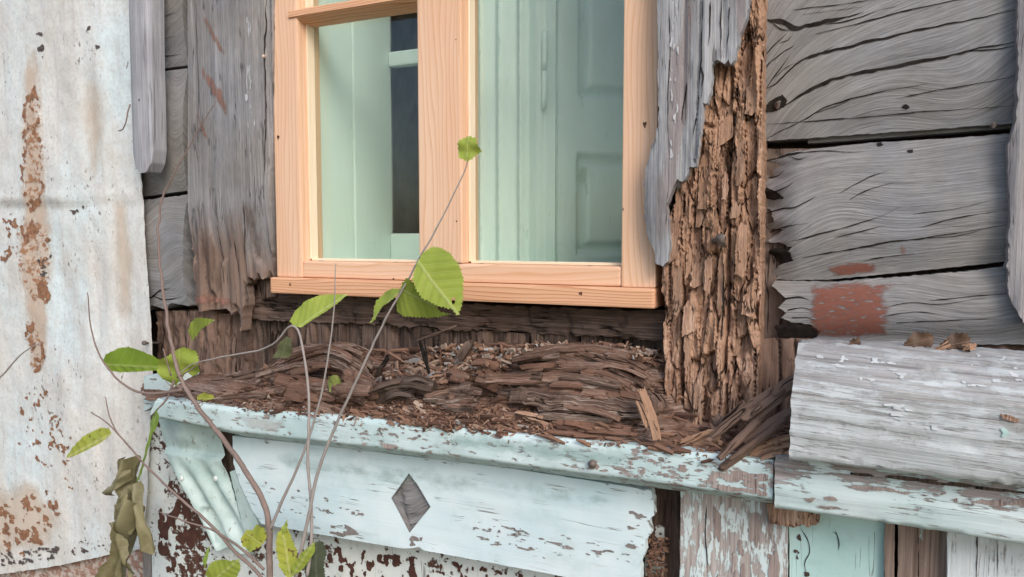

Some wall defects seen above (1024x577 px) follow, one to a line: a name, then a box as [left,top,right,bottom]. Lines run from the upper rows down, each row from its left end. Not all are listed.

crack [766,0,1016,261]
rust [16,67,51,373]
spalling [661,0,768,425]
crack [784,296,816,321]
crack [880,293,1009,323]
peeling [350,424,421,450]
peeling [586,458,687,482]
peeling [699,467,768,496]
rust [0,487,60,557]
peeling [158,481,199,577]
peeling [713,506,721,542]
peeling [731,512,780,577]